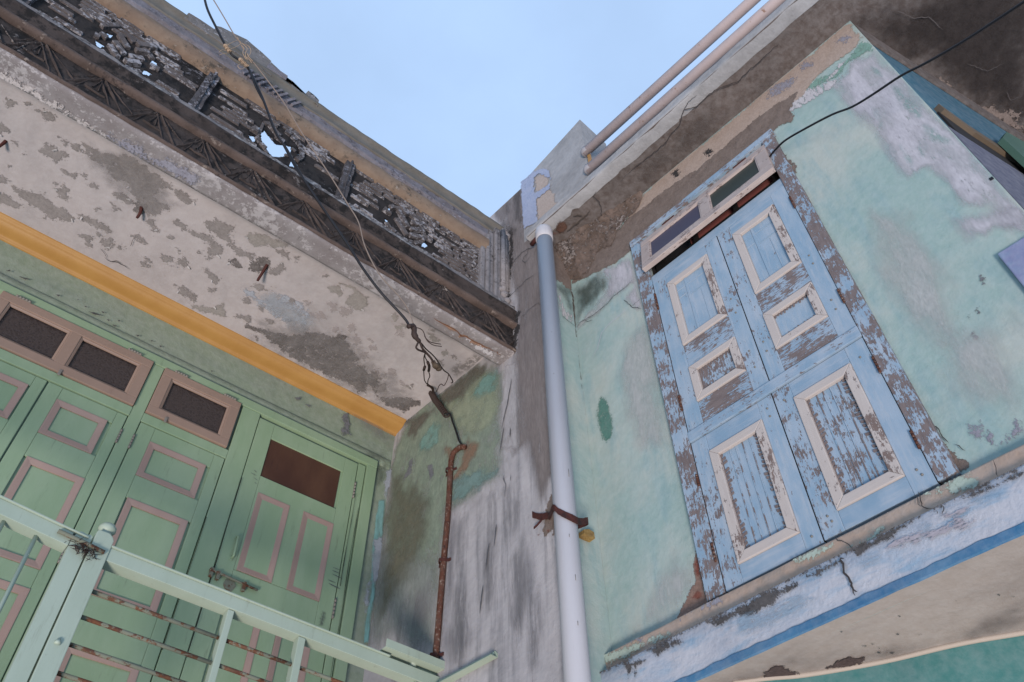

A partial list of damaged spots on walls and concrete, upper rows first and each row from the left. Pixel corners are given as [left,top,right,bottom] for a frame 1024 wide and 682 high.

peeling [0,72,112,138]
peeling [553,22,1024,307]
peeling [534,174,558,219]
crack [567,192,602,231]
peeling [0,122,421,413]
leakage [372,357,501,642]
flaking render [677,551,722,622]
peeling [793,526,884,563]
crack [835,537,857,595]
peeling [604,631,670,664]
flaking render [762,666,800,678]
flaking render [825,644,895,669]